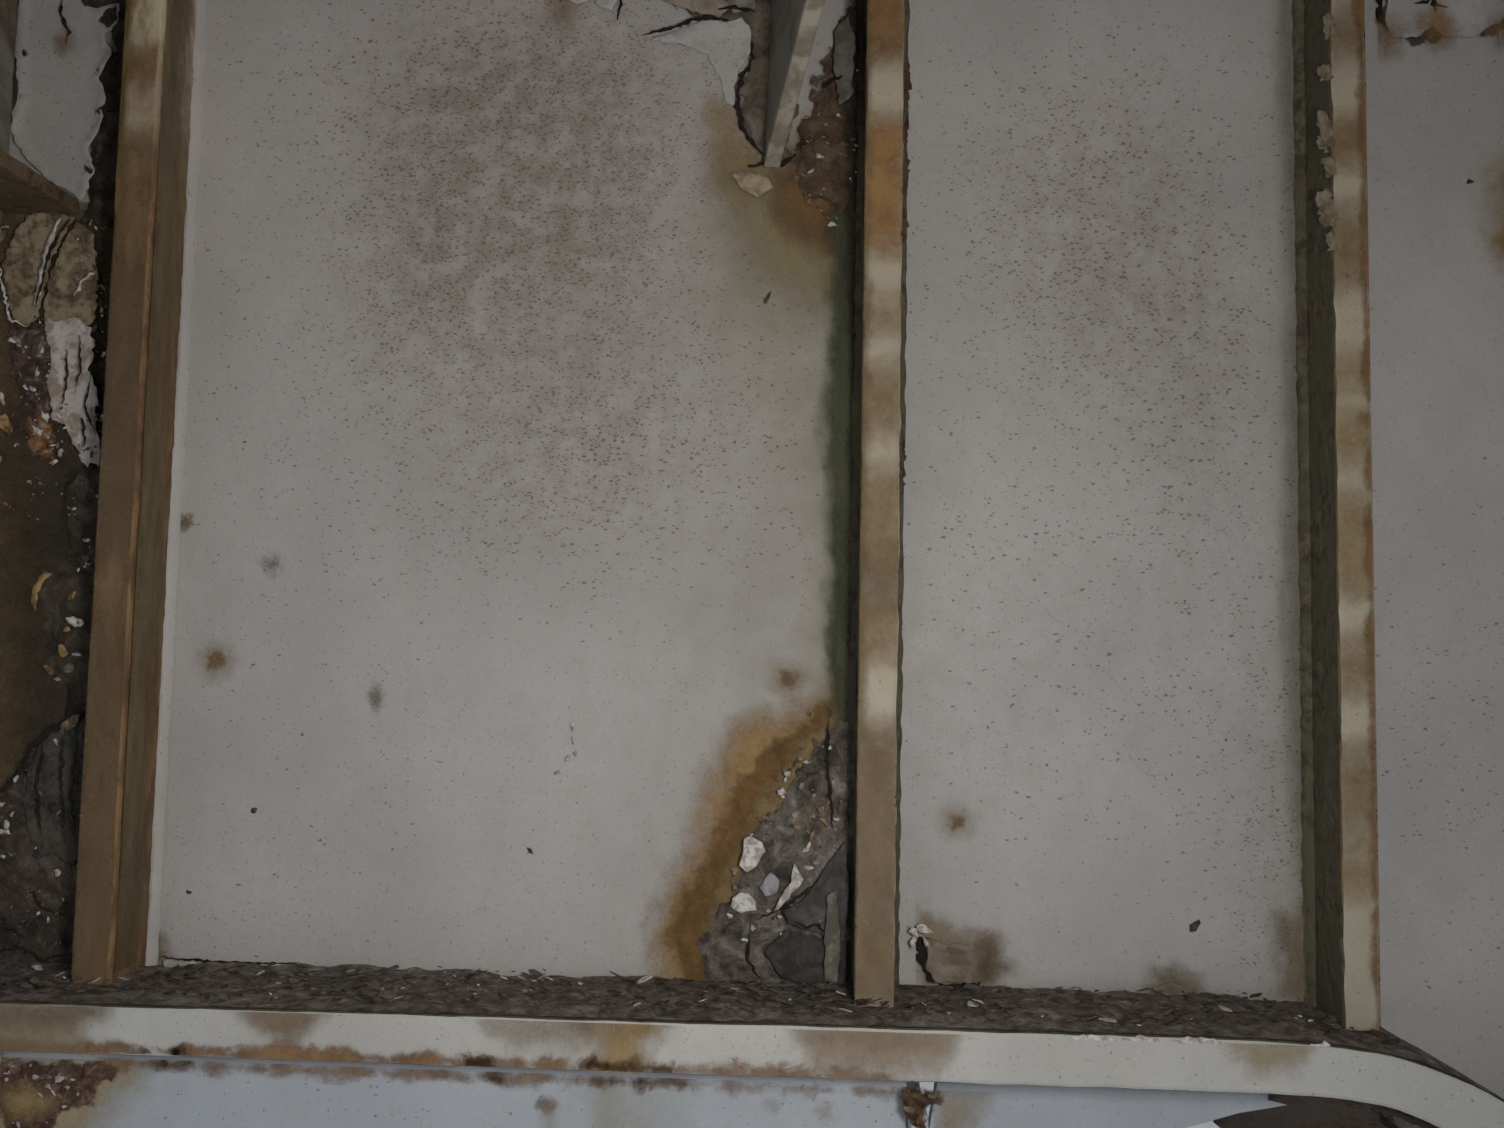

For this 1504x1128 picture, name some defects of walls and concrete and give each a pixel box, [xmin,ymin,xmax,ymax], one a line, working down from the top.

peeling [560,0,623,20]
peeling [1375,0,1504,46]
peeling [643,0,799,188]
peeling [0,0,129,500]
damp [824,0,865,722]
corrosion [658,0,997,1004]
corrosion [0,1004,812,1128]
corrosion [828,1067,974,1128]
crack [1370,1108,1423,1128]